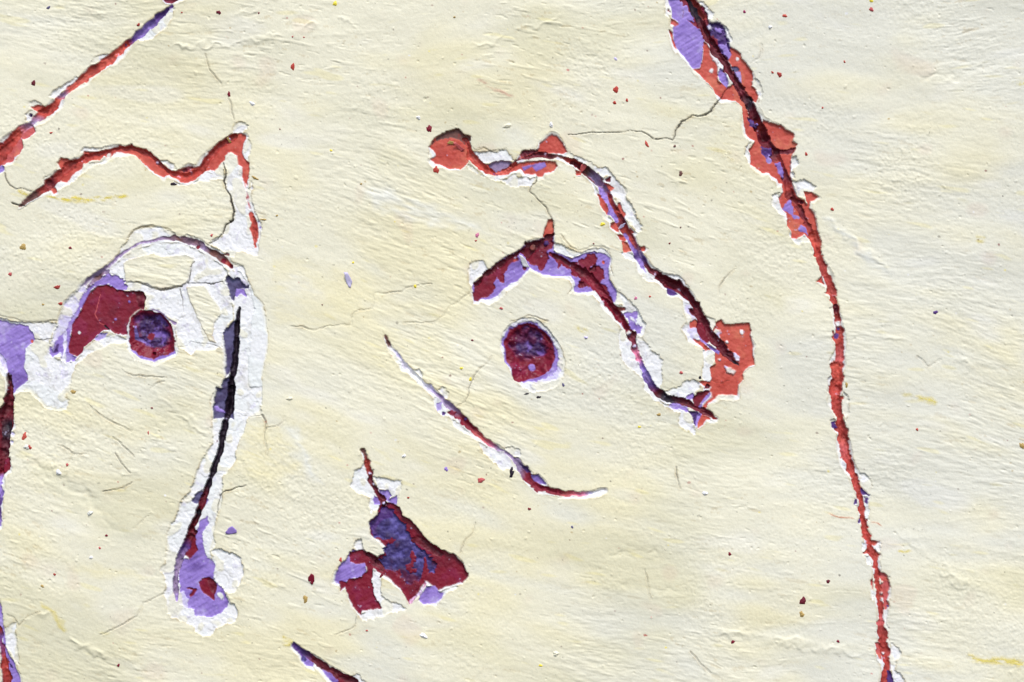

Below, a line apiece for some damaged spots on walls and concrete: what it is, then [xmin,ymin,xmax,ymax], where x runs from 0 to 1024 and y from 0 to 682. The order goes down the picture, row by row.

peeling [210,137,263,258]
peeling [0,267,147,530]
crack [383,0,905,682]
peeling [331,448,469,621]